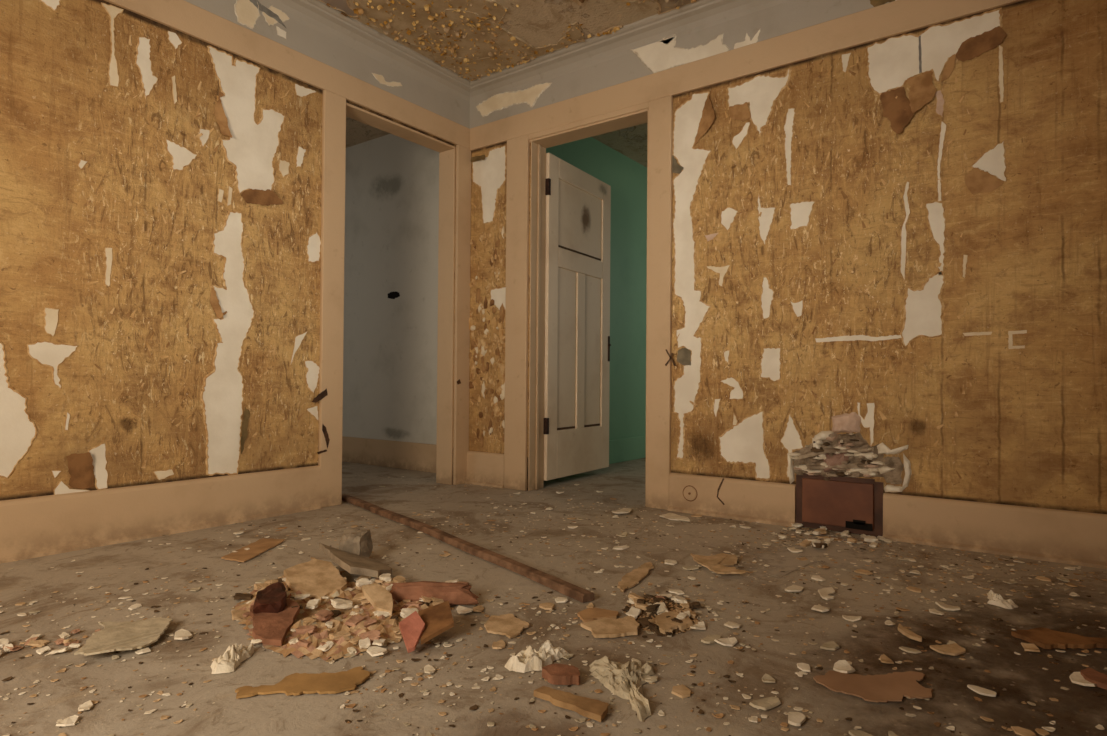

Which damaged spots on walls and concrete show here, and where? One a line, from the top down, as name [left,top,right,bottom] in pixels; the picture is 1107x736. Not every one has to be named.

peeling [135,36,158,99]
peeling [631,29,761,73]
peeling [727,67,792,150]
peeling [865,8,1007,134]
peeling [471,145,507,224]
peeling [200,45,286,476]
peeling [665,91,772,481]
peeling [900,121,947,348]
peeling [27,307,79,389]
peeling [0,341,38,479]
peeling [51,443,108,495]
flaking render [780,402,912,492]